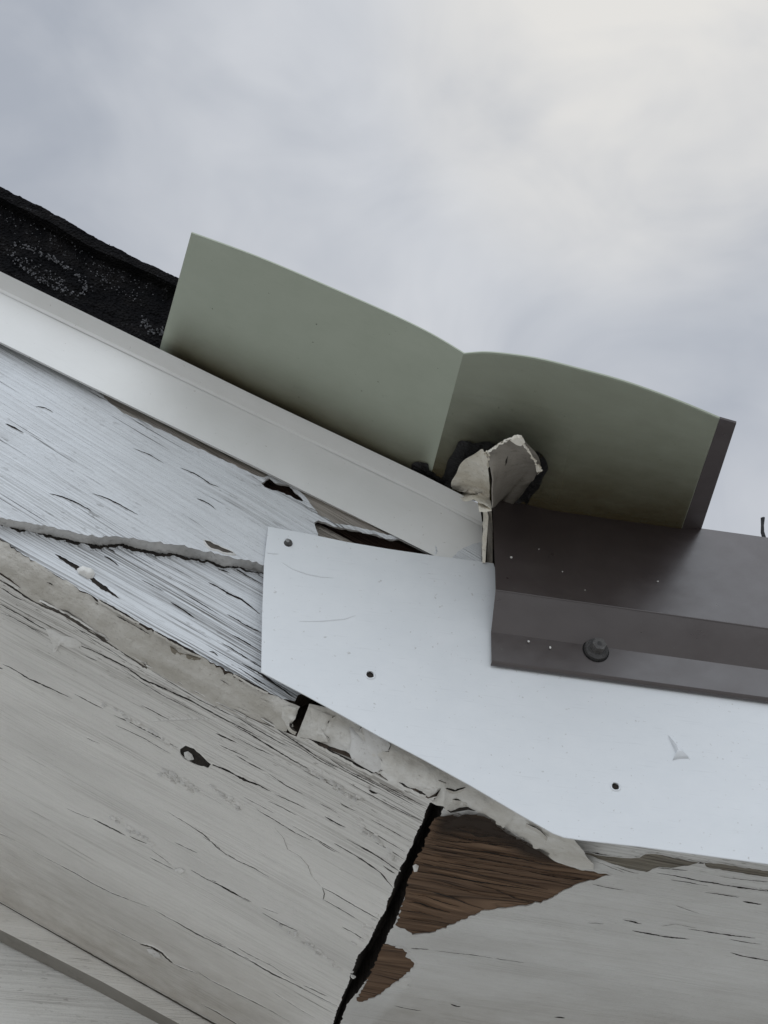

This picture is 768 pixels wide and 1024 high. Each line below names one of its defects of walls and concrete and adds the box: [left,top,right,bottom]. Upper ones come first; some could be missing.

peeling [91,388,400,539]
peeling [203,539,236,555]
peeling [282,706,336,742]
peeling [349,727,391,774]
crack [0,525,768,963]
peeling [395,811,768,936]
peeling [357,944,417,1002]